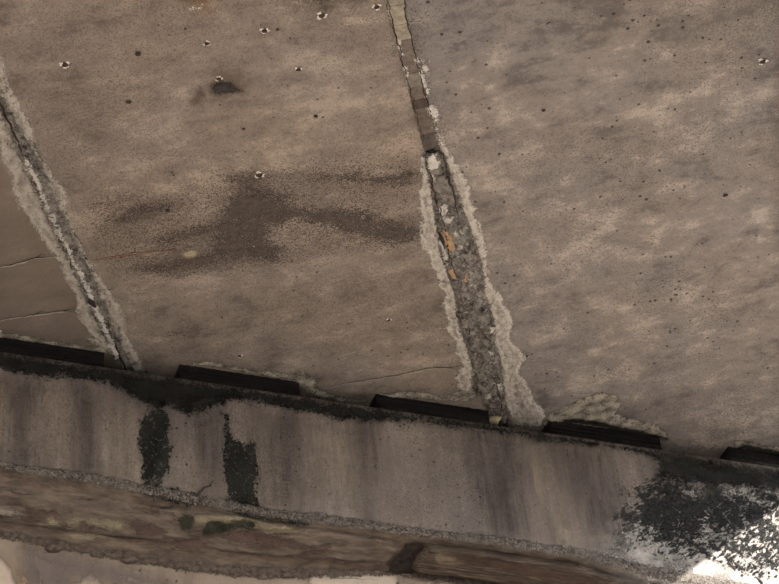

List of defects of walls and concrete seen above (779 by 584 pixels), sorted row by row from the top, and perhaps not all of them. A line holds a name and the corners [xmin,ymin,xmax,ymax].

leakage [0,0,668,442]
crack [0,253,57,268]
crack [0,307,77,322]
leakage [224,503,309,526]
leakage [0,536,310,584]